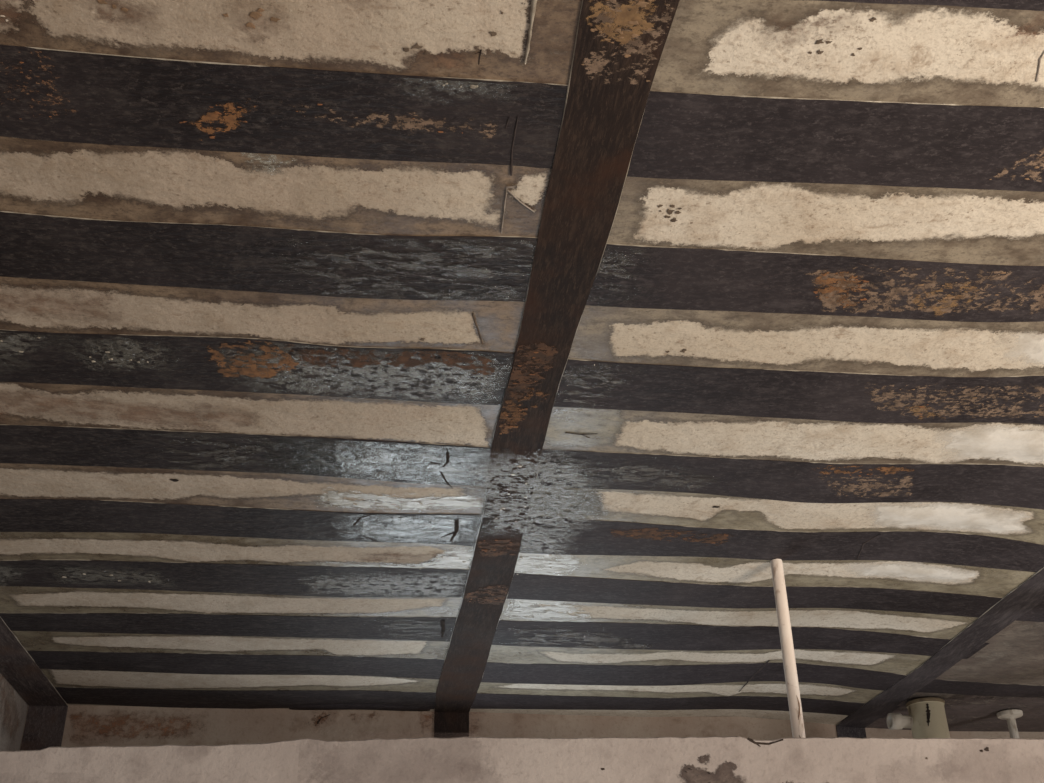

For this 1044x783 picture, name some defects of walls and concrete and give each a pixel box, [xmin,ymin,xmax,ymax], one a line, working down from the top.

rust [581,0,674,85]
rust [179,103,256,141]
rust [989,149,1044,182]
rust [808,264,1044,317]
rust [205,341,496,378]
leakage [0,136,1044,659]
rust [499,338,558,435]
rust [867,382,1044,421]
rust [817,465,915,498]
spalling [680,755,744,783]